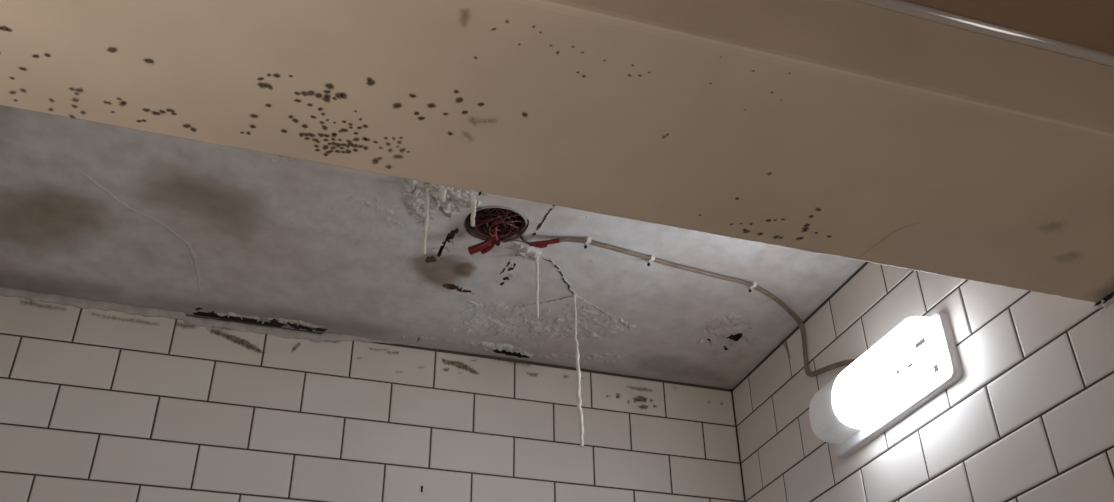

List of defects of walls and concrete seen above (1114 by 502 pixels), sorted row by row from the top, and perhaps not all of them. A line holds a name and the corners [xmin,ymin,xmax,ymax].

water stain [137,109,196,132]
water stain [281,84,409,169]
peeling [400,178,486,263]
crack [500,205,614,319]
spalling [442,283,475,295]
crack [193,307,328,332]
peeling [476,341,541,358]